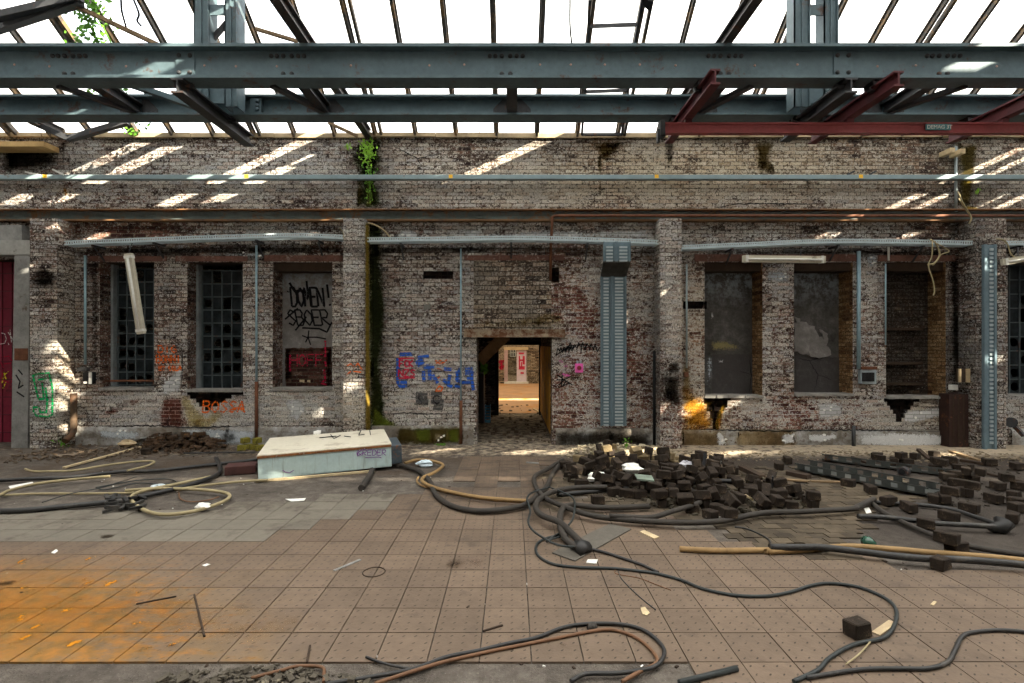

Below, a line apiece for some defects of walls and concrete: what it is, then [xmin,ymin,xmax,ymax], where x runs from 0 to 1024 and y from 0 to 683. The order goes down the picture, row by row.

damp [756,142,774,172]
flaking render [794,316,831,358]
spalling [161,370,254,444]
spalling [859,399,941,445]